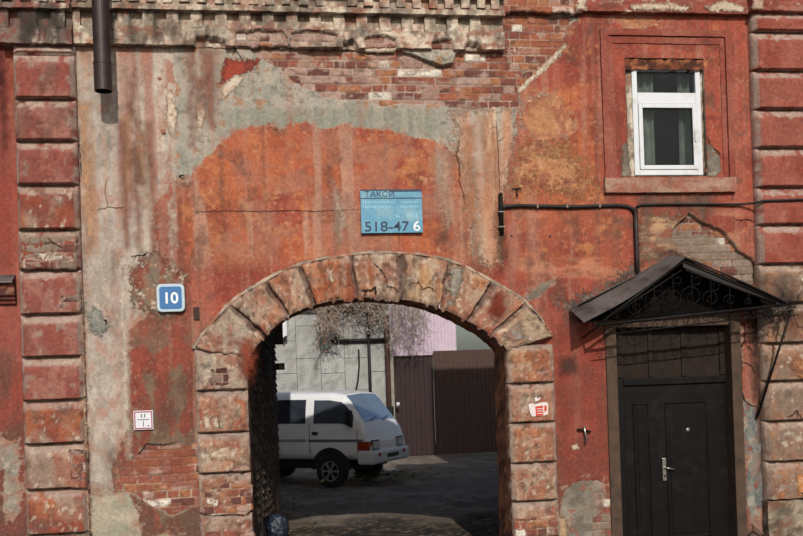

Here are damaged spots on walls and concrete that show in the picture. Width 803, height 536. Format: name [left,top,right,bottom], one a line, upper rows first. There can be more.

peeling [21,0,611,536]
crack [360,263,436,298]
flaking render [547,206,754,318]
peeling [0,437,23,520]
peeling [743,400,763,533]